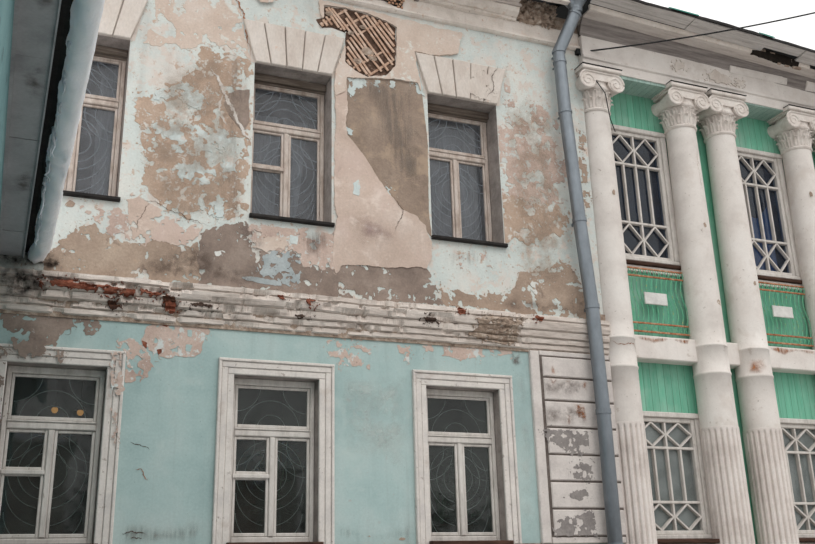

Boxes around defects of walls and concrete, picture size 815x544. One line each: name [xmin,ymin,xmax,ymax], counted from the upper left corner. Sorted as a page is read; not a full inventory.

flaking render [512,0,558,30]
crack [210,66,251,141]
peeling [65,0,544,365]
peeling [0,313,101,364]
flaking render [36,274,212,397]
peeling [323,338,375,372]
peeling [538,425,600,540]